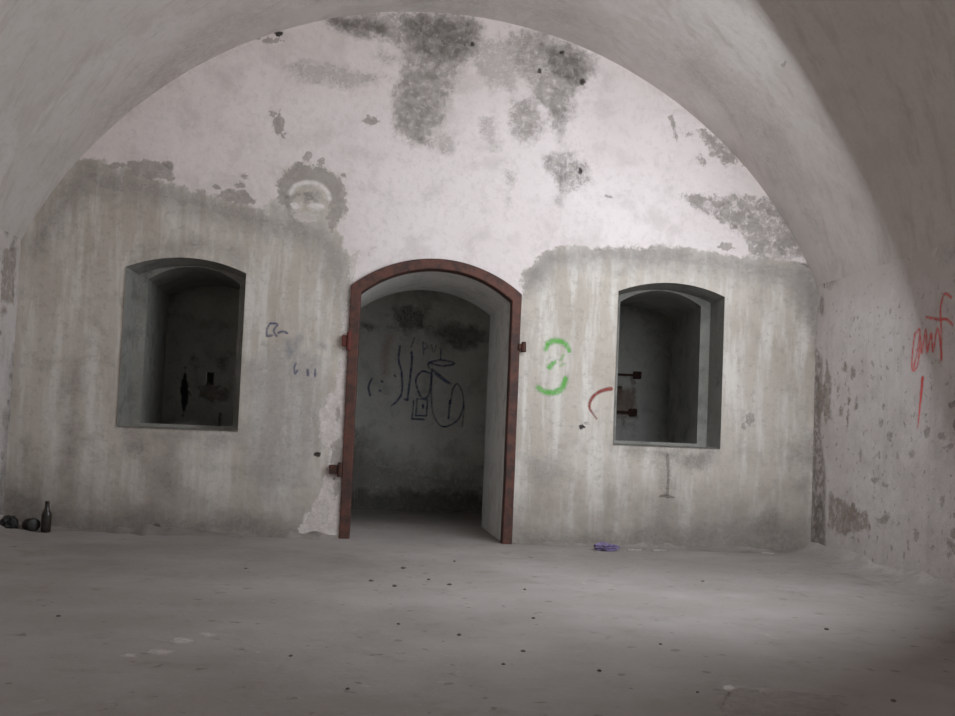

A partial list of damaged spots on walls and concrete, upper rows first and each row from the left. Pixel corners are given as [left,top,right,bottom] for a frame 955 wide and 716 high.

water stain [328,12,596,153]
water stain [544,153,589,203]
flaking render [684,194,803,259]
flaking render [298,292,351,537]
spalling [811,350,890,546]